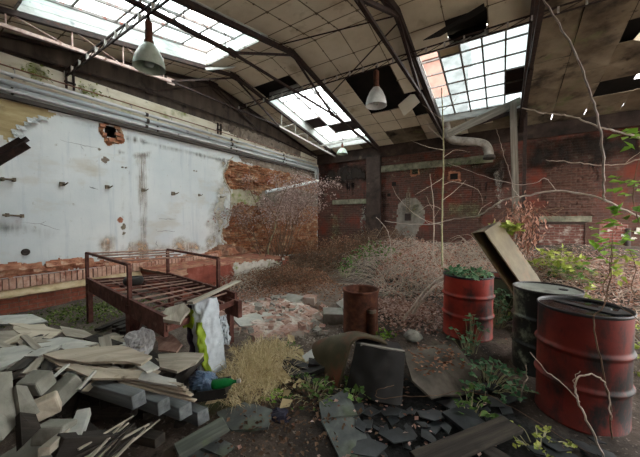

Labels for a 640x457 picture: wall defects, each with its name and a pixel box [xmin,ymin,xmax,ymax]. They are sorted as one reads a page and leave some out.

peeling [0,98,56,147]
spalling [97,123,125,165]
flaking render [187,156,319,286]
flaking render [0,254,195,278]